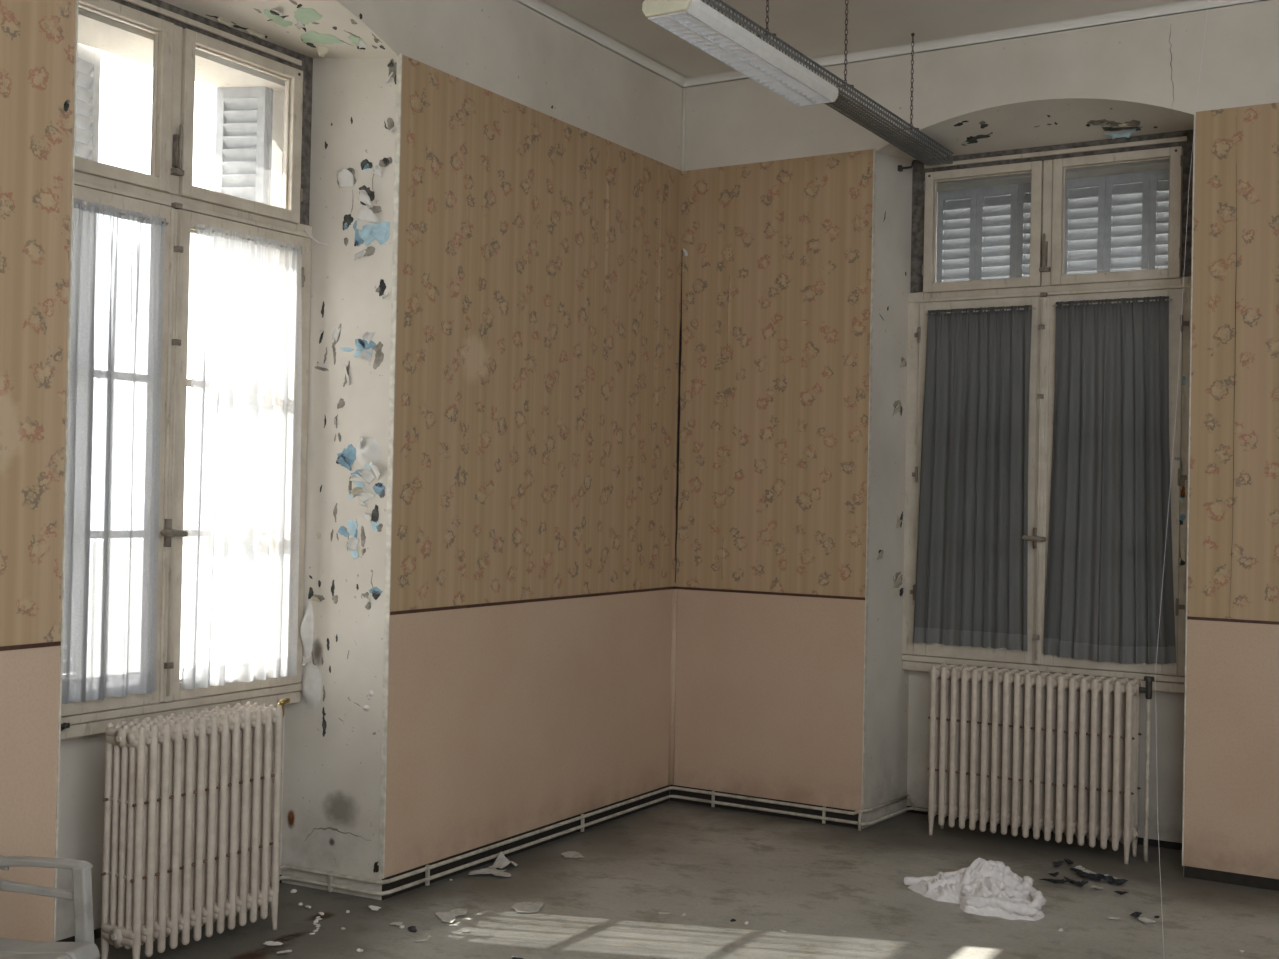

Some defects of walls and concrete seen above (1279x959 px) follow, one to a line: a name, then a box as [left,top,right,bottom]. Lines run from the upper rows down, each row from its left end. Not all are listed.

peeling [253,0,397,84]
peeling [954,120,993,146]
peeling [1086,108,1158,139]
peeling [337,157,392,260]
peeling [375,279,388,299]
peeling [340,332,384,369]
peeling [316,436,385,559]
peeling [308,575,338,604]
peeling [356,571,383,610]